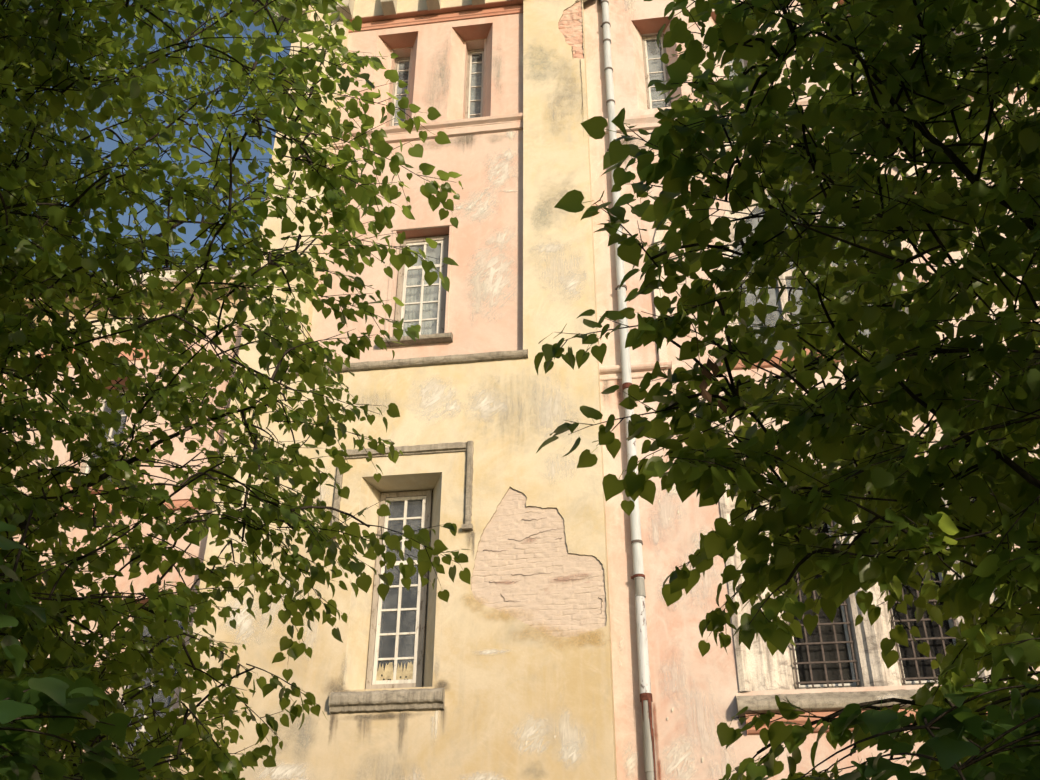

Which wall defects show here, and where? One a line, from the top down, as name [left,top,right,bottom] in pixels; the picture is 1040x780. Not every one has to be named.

spalling [558,0,584,59]
spalling [471,487,607,638]
damp [356,713,405,740]